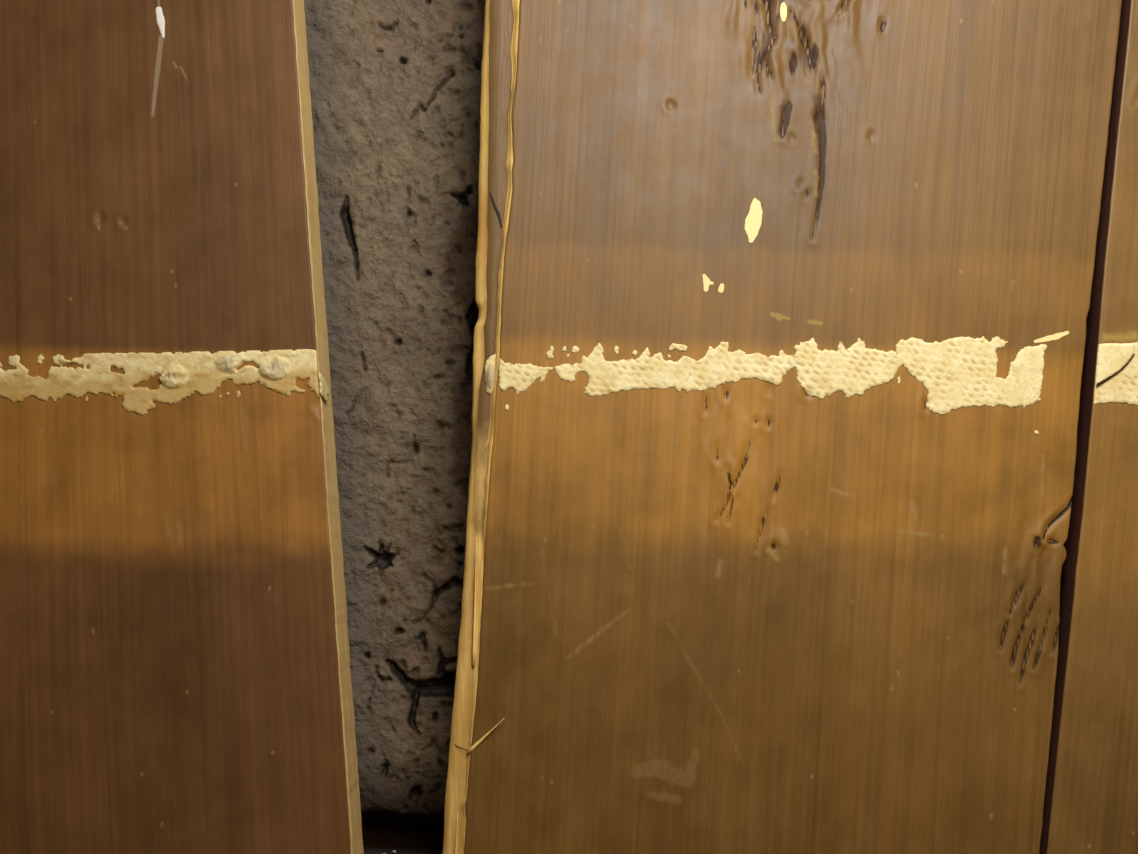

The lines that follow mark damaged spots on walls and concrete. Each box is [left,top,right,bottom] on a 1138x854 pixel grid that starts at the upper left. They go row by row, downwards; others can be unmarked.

peeling [745,198,762,243]
peeling [0,349,330,415]
peeling [465,300,1069,415]
peeling [1094,342,1138,406]
crack [431,578,463,606]